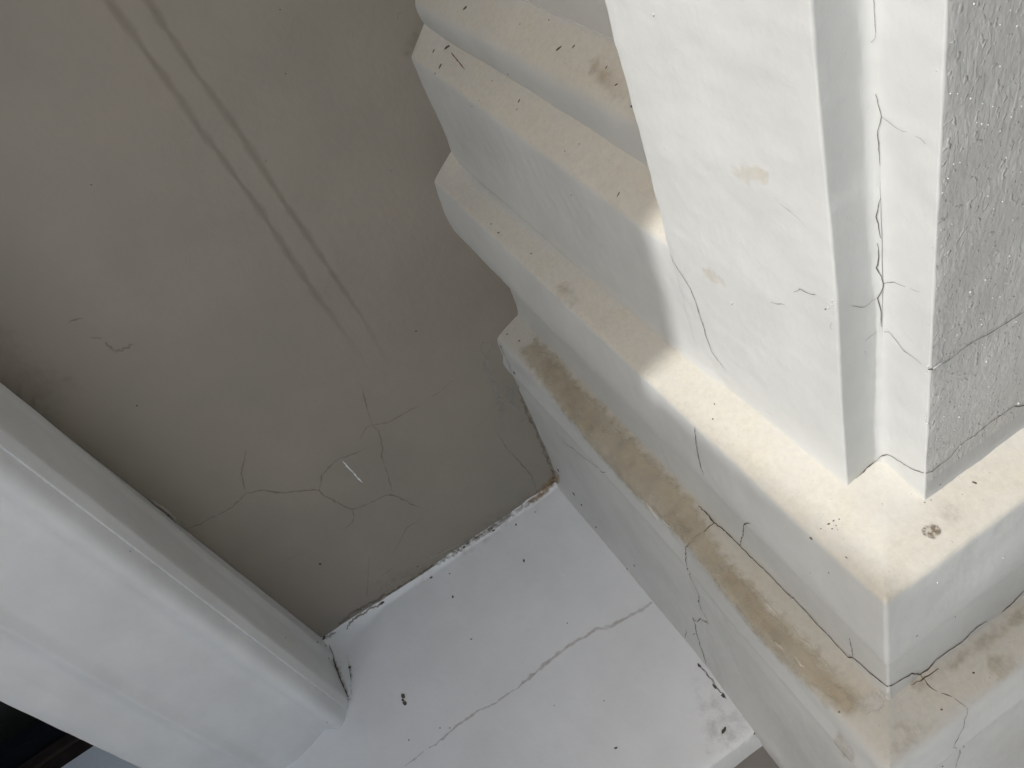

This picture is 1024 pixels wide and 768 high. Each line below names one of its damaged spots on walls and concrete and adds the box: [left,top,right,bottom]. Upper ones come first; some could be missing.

crack [875,94,922,162]
crack [855,198,1022,367]
crack [856,405,1024,479]
crack [685,506,1024,765]